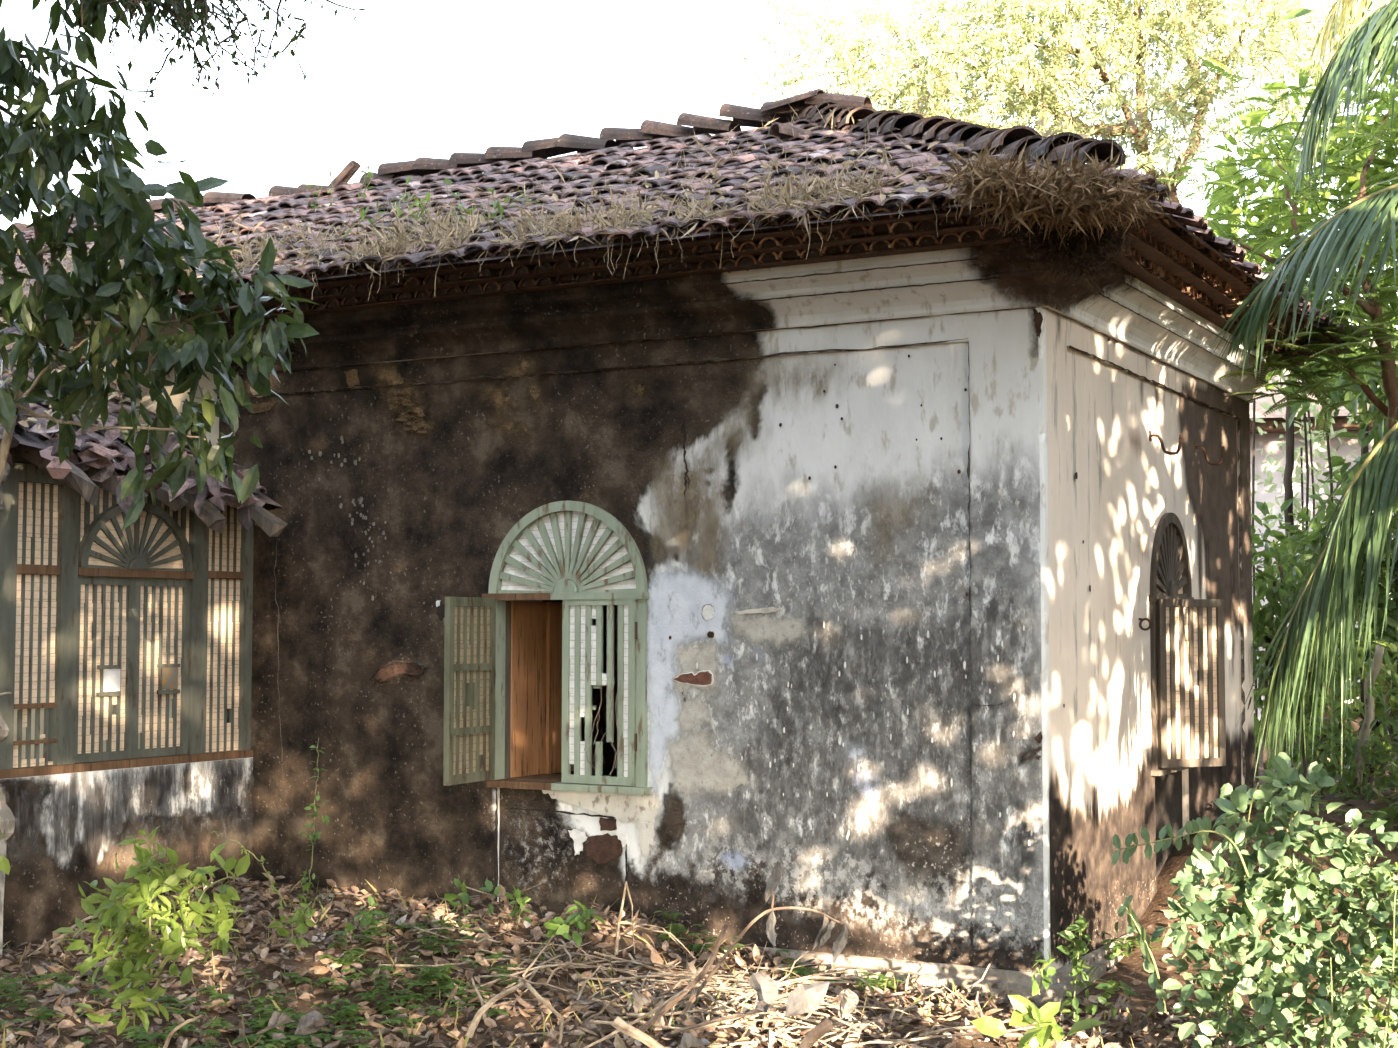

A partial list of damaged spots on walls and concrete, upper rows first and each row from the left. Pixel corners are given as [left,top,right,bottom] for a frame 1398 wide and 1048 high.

damp [1179,383,1253,659]
damp [0,272,1157,973]
flaking render [568,817,629,864]
peeling [669,630,754,796]
peeling [729,612,806,661]
damp [1189,728,1255,836]